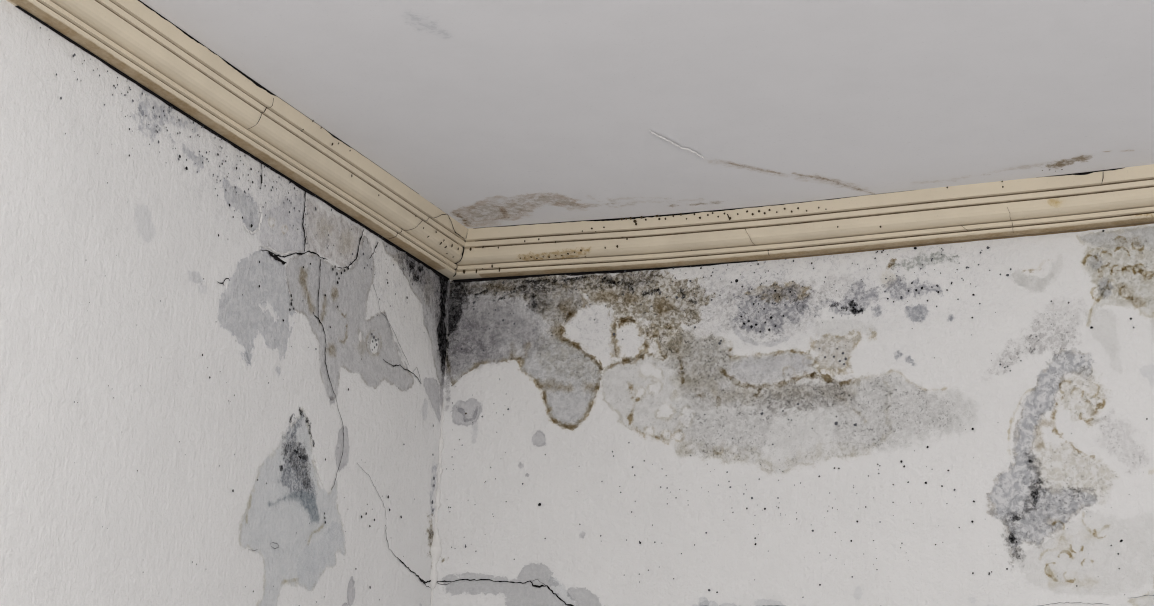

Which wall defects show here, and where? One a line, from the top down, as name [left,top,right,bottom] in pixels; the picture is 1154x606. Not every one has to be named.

leakage [145,106,334,249]
leakage [303,235,803,386]
crack [15,0,1154,490]
leakage [811,262,863,323]
crack [386,537,574,606]